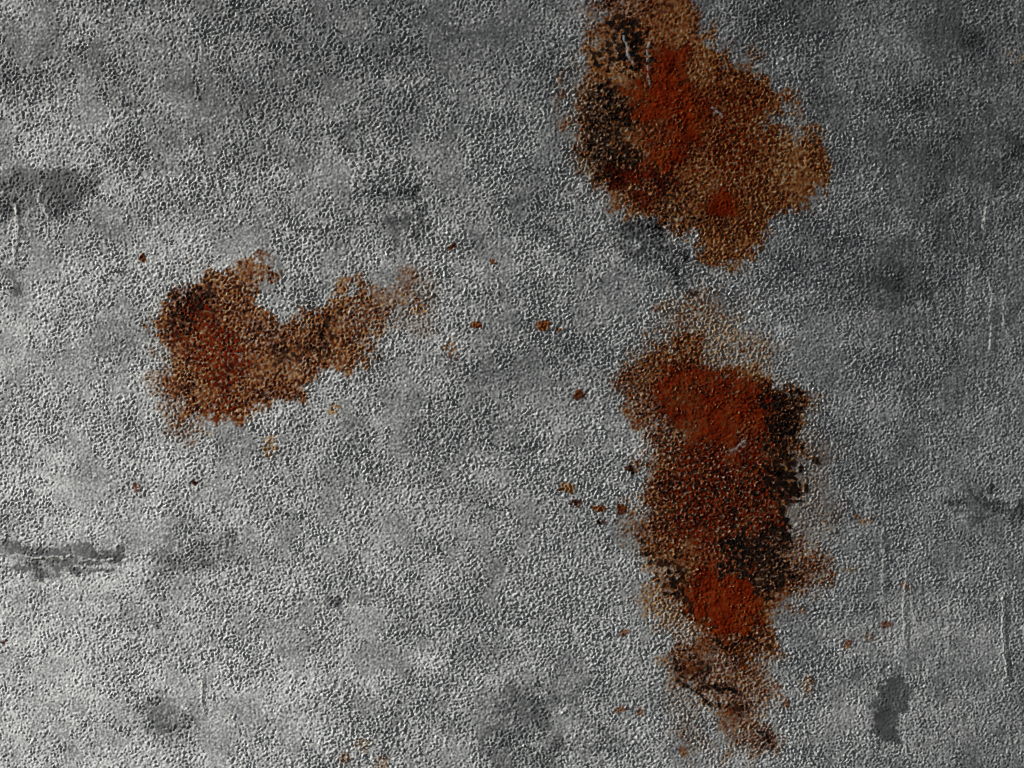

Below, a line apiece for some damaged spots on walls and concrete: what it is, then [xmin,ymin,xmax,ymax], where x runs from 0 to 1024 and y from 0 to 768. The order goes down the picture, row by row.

rust [558,0,833,274]
rust [142,250,435,449]
rust [558,288,856,762]